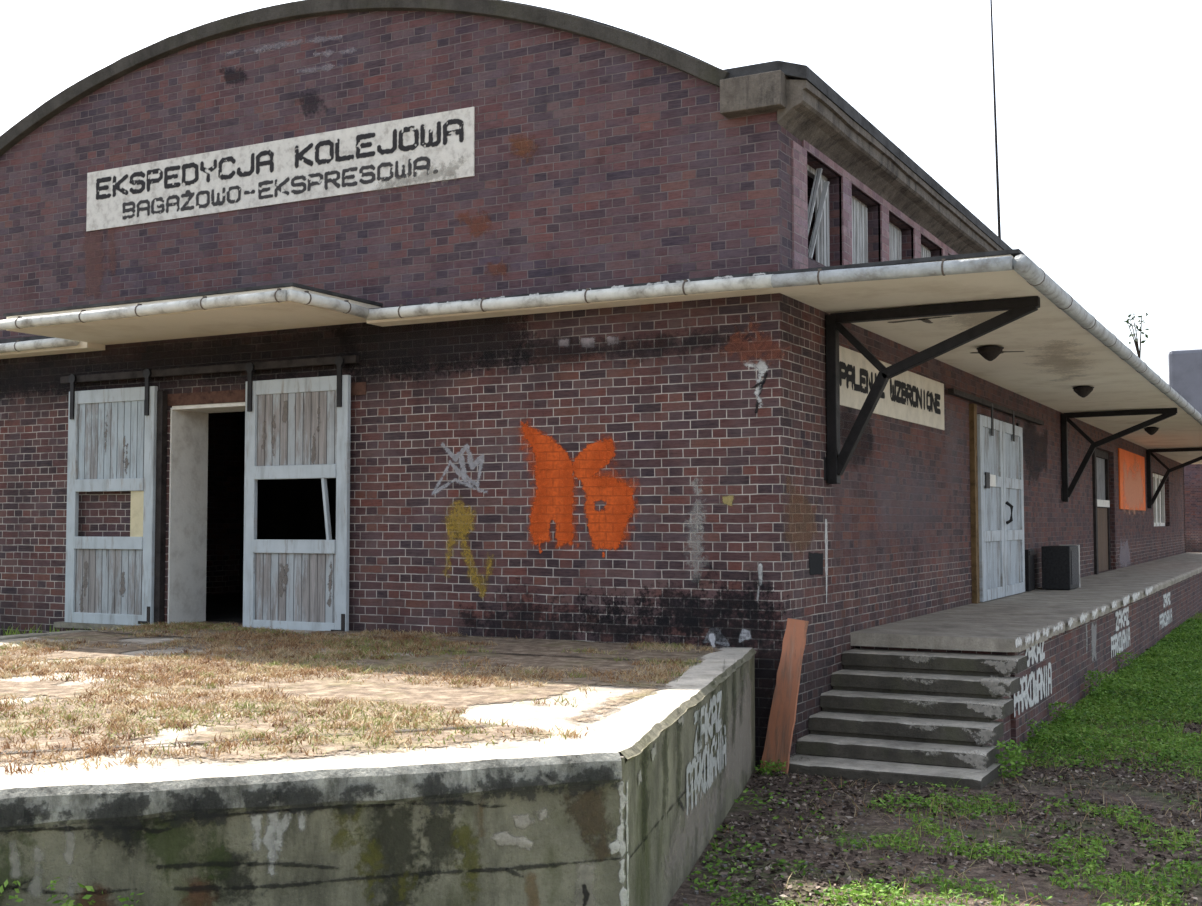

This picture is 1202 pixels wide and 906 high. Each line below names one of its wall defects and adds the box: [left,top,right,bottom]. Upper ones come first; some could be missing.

spalling [955,588,1153,770]
water stain [0,756,621,906]
spalling [565,770,642,906]